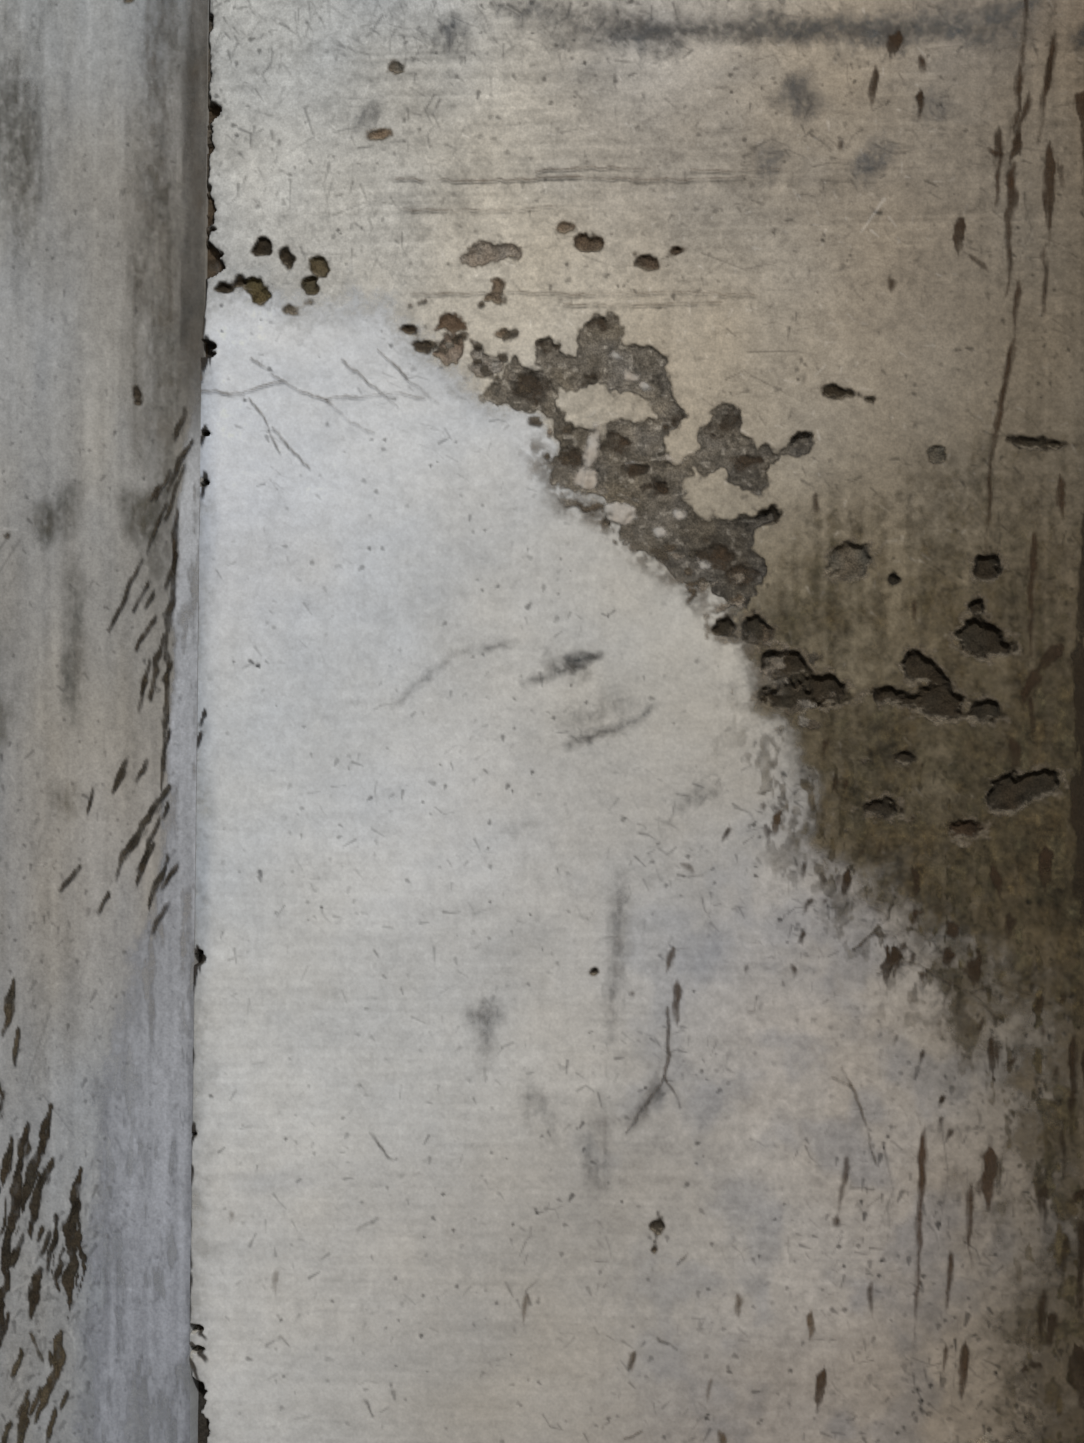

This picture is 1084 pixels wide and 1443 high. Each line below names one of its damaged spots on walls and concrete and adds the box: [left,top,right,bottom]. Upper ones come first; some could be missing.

spalling [460,240,522,307]
spalling [634,246,684,271]
spalling [400,312,1008,731]
water stain [773,539,885,665]
water stain [801,575,1084,1029]
spalling [950,553,1021,664]
rust [995,345,1013,433]
rust [990,39,1056,315]
rust [1021,519,1084,915]
rust [881,944,914,979]
peeling [0,1103,86,1443]
water stain [1027,1048,1084,1358]